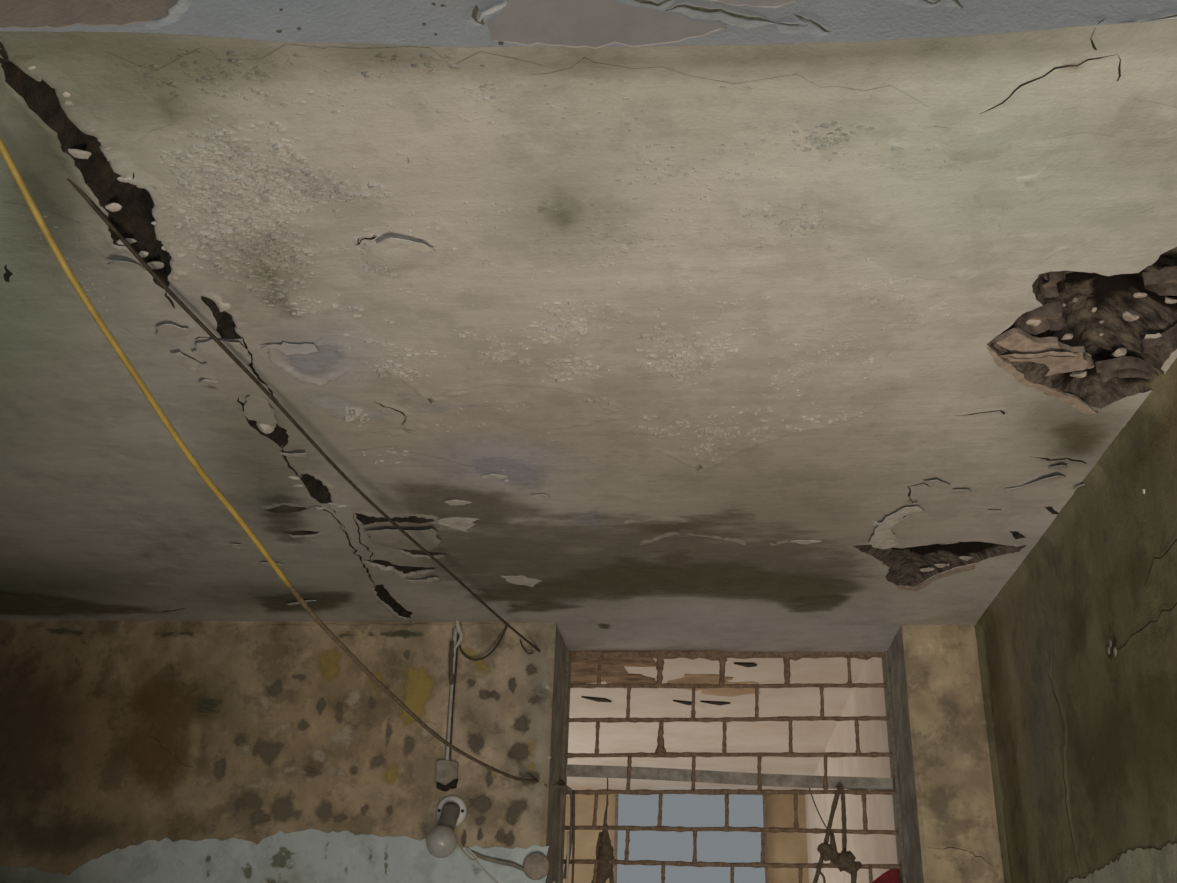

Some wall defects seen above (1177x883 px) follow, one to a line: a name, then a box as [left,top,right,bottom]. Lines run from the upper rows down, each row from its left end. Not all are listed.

crack [619,0,831,37]
crack [900,0,965,9]
crack [979,9,1177,114]
crack [0,32,308,477]
spalling [987,247,1177,414]
leakage [407,486,853,612]
spalling [853,506,1026,591]
leakage [261,594,349,611]
crack [366,584,417,622]
spalling [507,716,539,785]
peeling [0,768,549,883]
peeling [1057,843,1177,883]